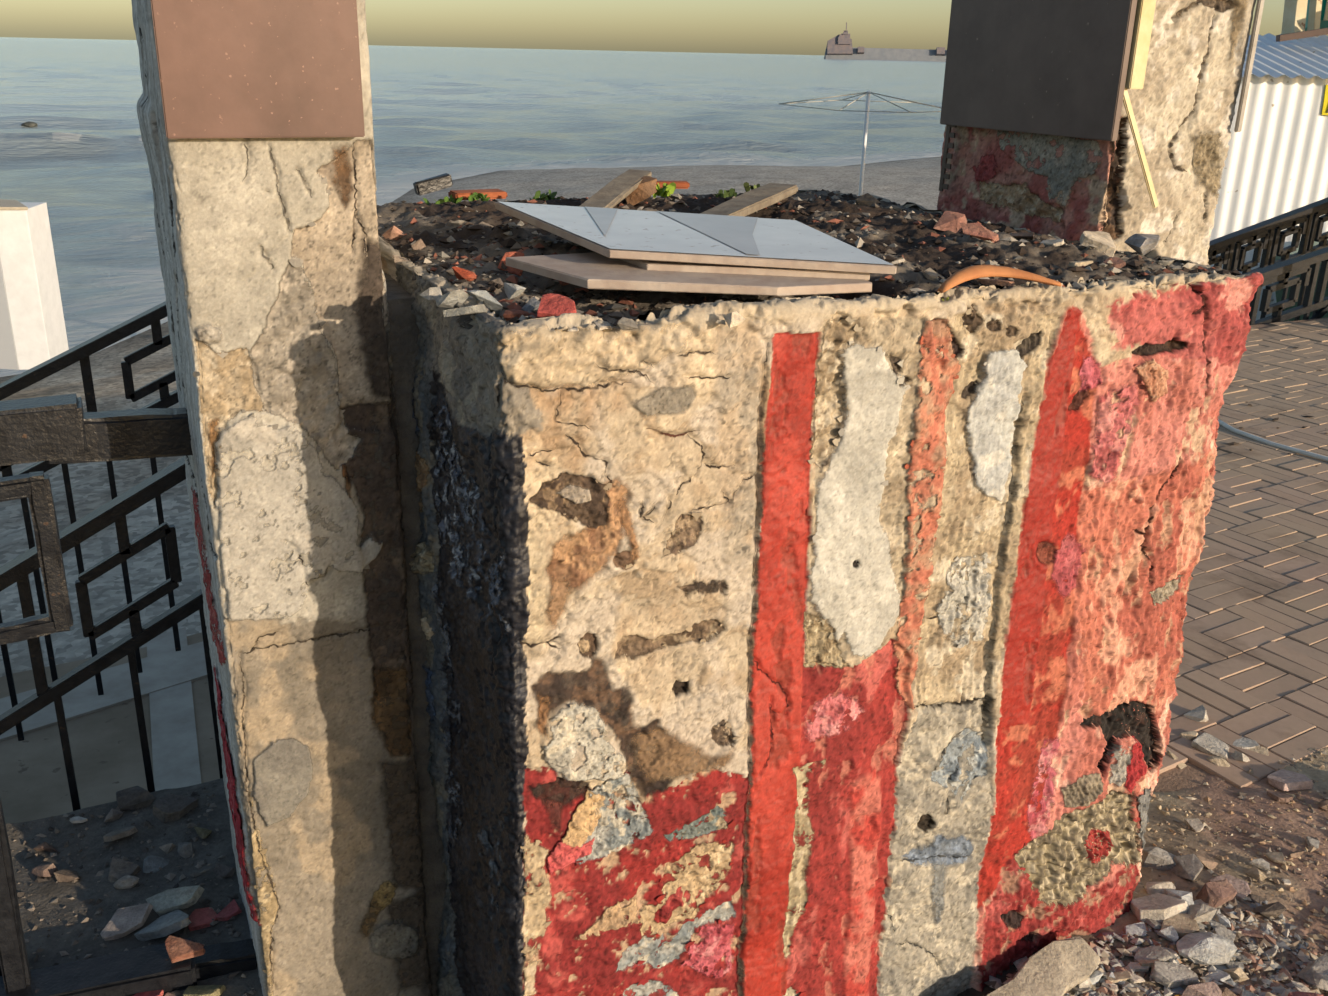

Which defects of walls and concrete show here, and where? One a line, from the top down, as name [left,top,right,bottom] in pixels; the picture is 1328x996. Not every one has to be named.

crack [243,144,311,270]
crack [351,145,368,253]
flaking render [972,117,1128,240]
crack [1165,0,1214,242]
flaking render [191,139,393,996]
spalling [530,472,612,529]
spalling [613,551,635,570]
spalling [663,512,703,556]
crack [1135,456,1181,584]
spalling [615,619,725,660]
spalling [1014,701,1158,907]